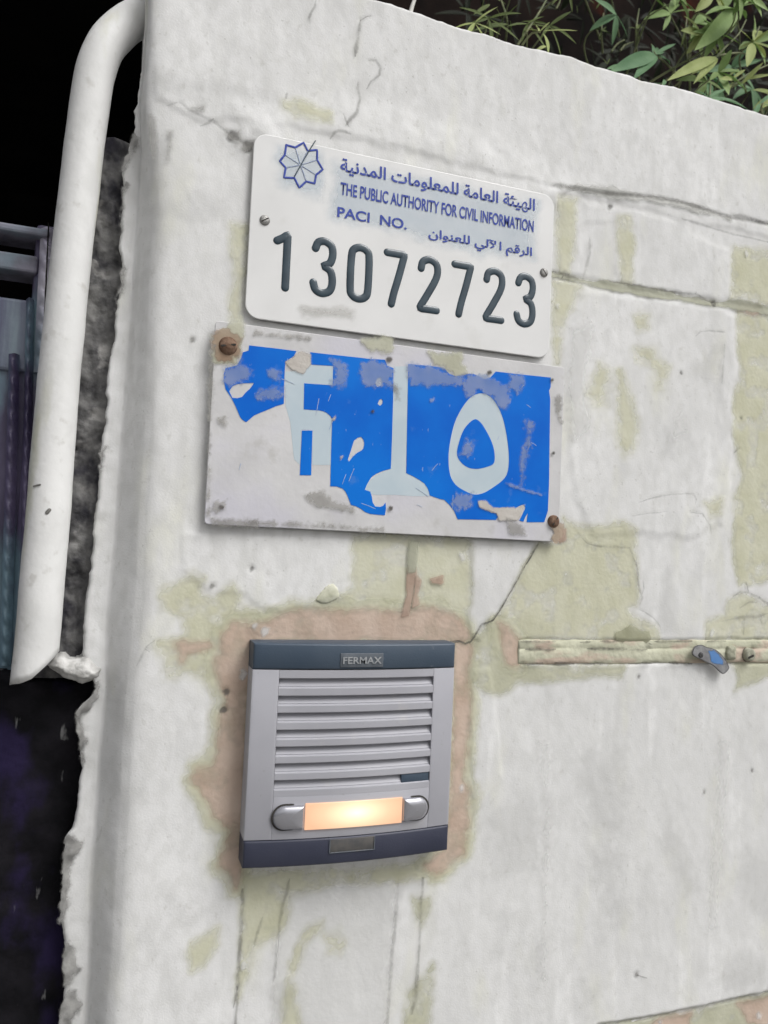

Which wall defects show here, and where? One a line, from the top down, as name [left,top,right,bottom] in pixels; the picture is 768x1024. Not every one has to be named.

crack [450,545,538,644]
spalling [76,681,100,763]
peeling [158,534,625,986]
spalling [58,835,83,923]
spalling [59,943,83,1024]